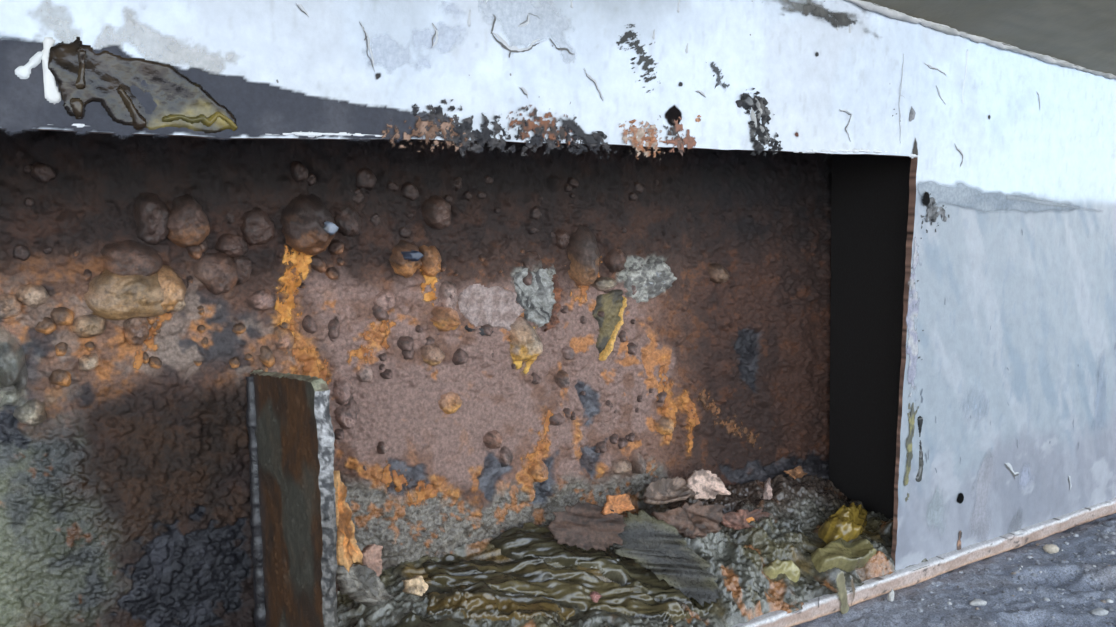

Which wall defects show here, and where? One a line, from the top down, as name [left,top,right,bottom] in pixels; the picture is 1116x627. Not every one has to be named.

rust [382,99,666,160]
rust [0,161,677,440]
rust [377,441,439,507]
rust [483,408,576,483]
rust [548,432,773,551]
rust [635,365,761,454]
rust [783,466,807,480]
rust [361,544,383,577]